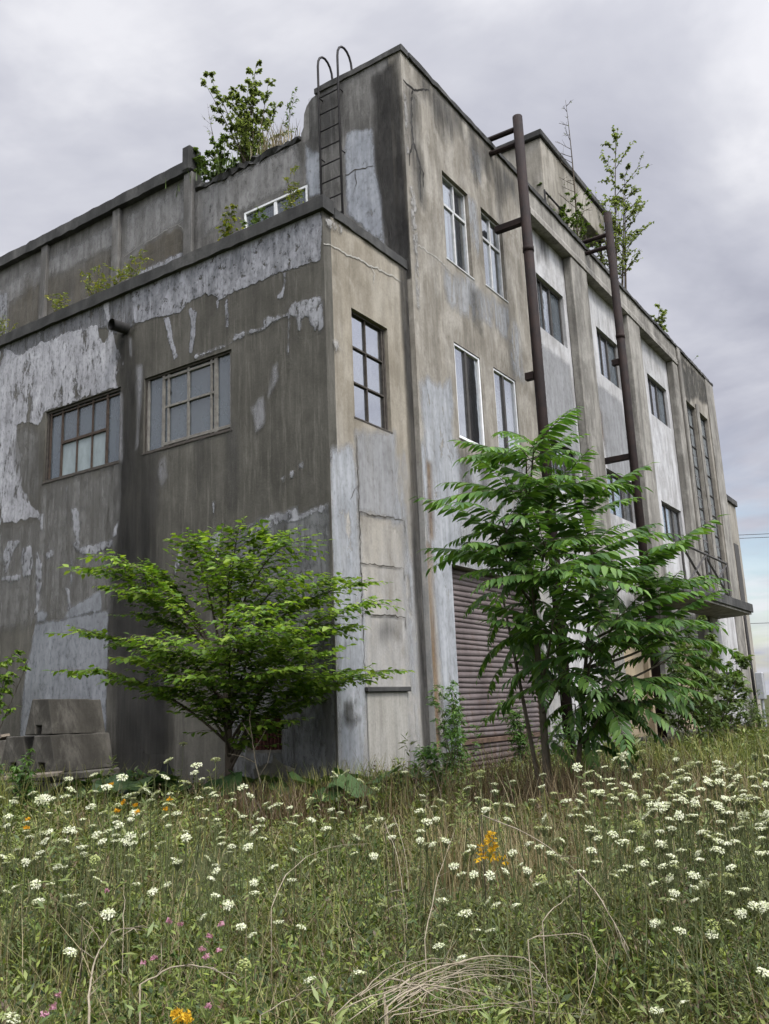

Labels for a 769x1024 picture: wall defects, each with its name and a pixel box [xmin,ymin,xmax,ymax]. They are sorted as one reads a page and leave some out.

crack [403,79,428,203]
peeling [0,293,8,334]
peeling [132,212,342,359]
peeling [0,302,124,530]
leakage [373,63,459,764]
peeling [2,540,54,622]
peeling [65,507,118,618]
crack [350,435,406,685]